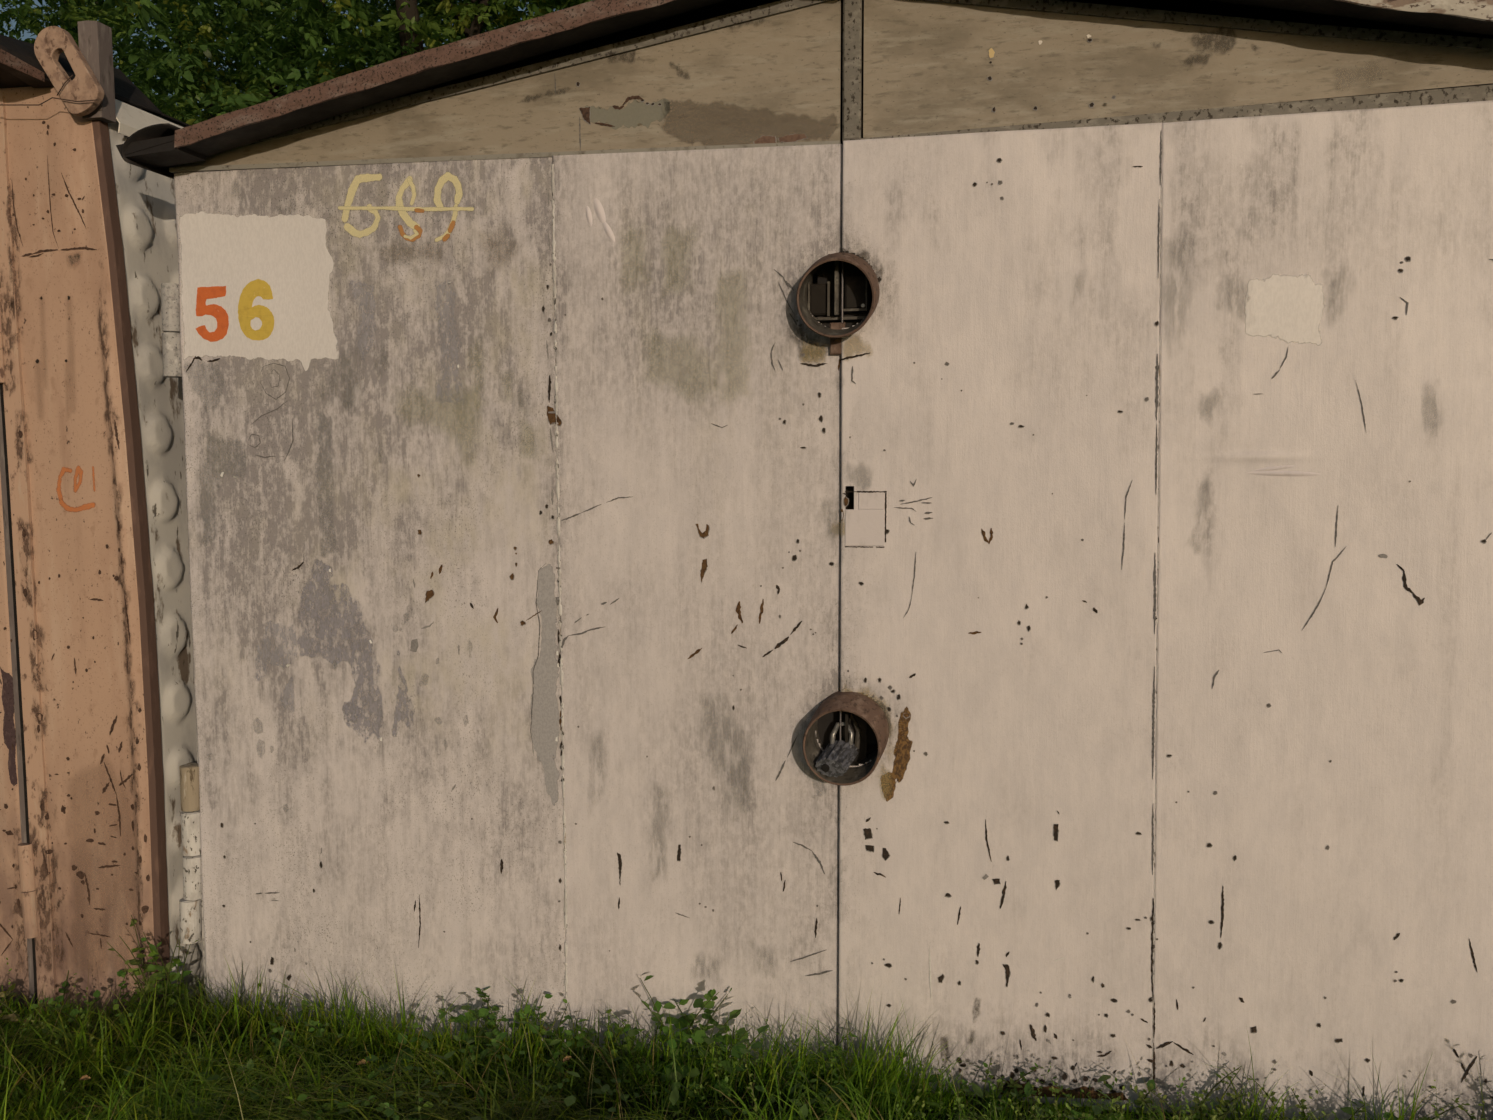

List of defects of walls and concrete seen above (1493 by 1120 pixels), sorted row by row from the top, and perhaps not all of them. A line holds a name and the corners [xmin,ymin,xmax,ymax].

peeling [579,96,670,129]
peeling [753,134,807,144]
peeling [541,285,566,450]
peeling [413,565,443,603]
peeling [256,560,433,741]
peeling [520,563,579,806]
peeling [0,667,17,809]
rust [877,701,912,801]
peeling [790,905,833,976]